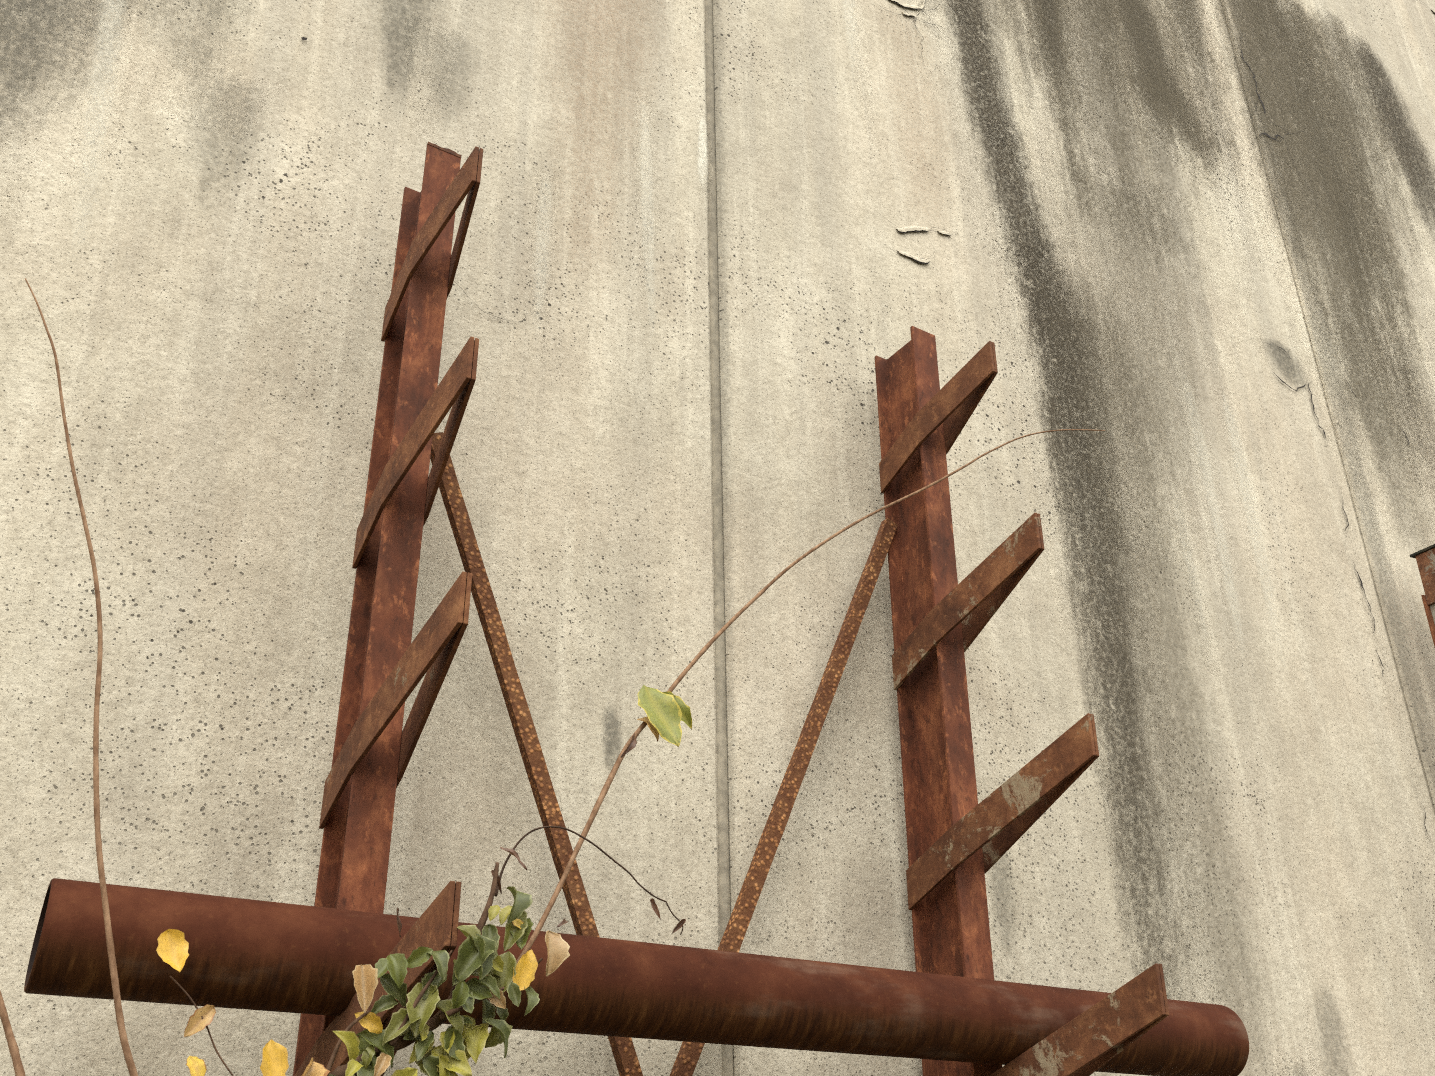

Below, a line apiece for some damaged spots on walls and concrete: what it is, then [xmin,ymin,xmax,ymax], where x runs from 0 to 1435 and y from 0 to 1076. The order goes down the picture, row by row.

leakage [0,0,98,87]
leakage [1026,0,1212,184]
leakage [1233,0,1435,395]
leakage [947,0,1170,968]
crack [1260,338,1420,698]